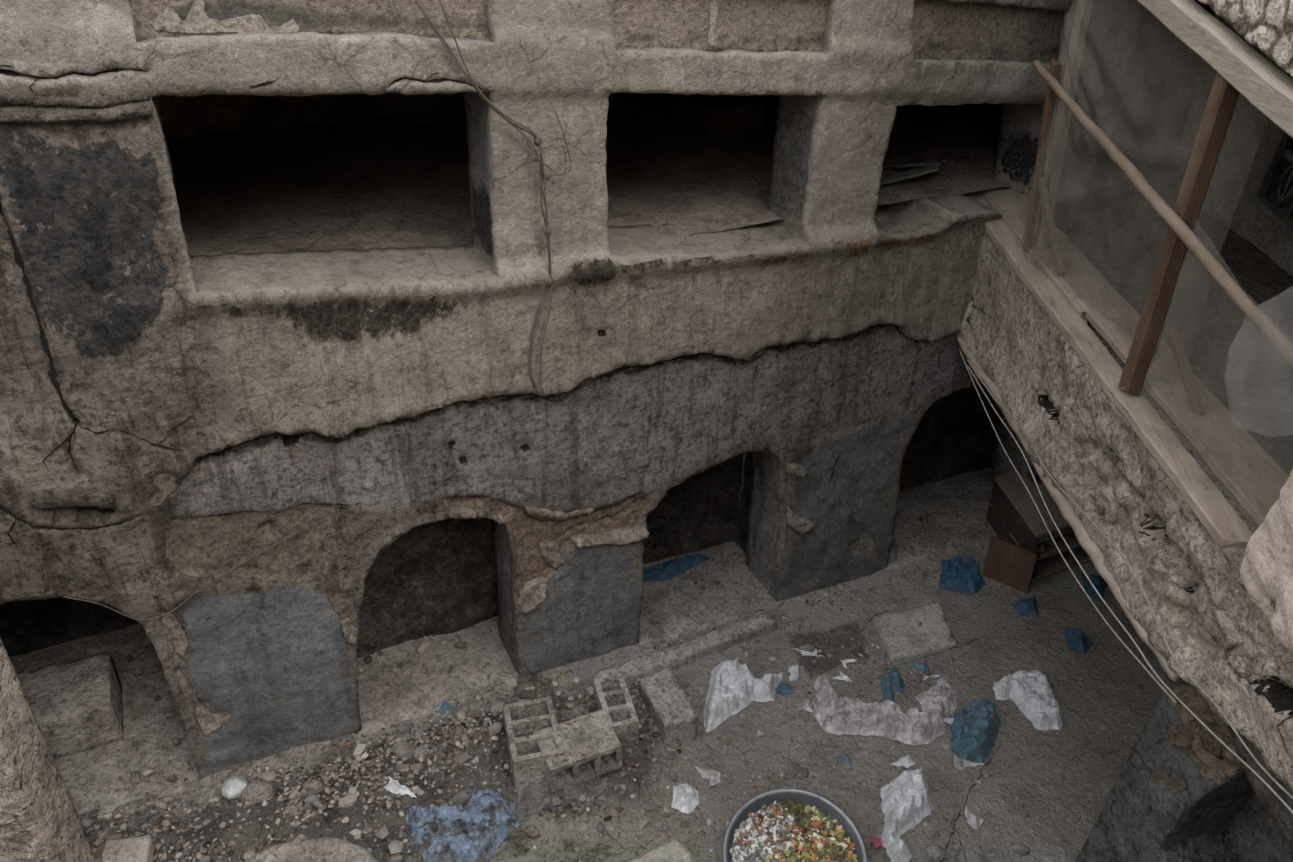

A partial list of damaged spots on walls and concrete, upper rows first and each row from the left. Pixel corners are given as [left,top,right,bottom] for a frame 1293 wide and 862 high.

crack [250,77,280,87]
crack [386,72,482,89]
damp [230,297,468,341]
crack [879,324,930,342]
crack [7,230,196,484]
spalling [442,493,655,614]